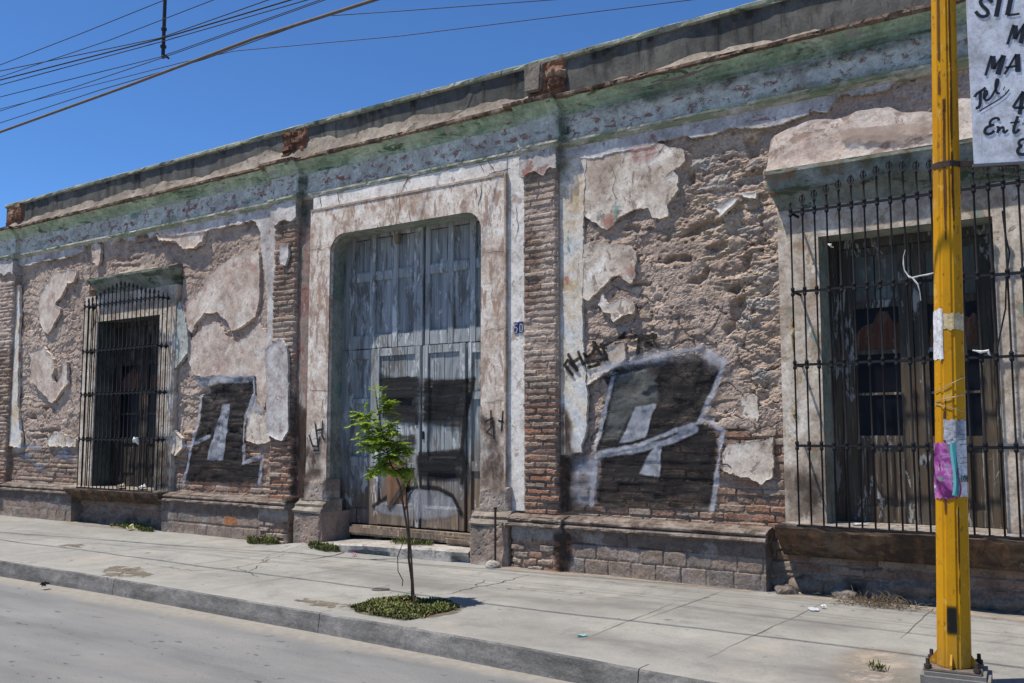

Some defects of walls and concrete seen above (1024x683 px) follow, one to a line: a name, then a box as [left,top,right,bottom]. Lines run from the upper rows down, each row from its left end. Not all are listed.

spalling [958,56,971,99]
spalling [9,208,291,497]
spalling [560,76,932,529]